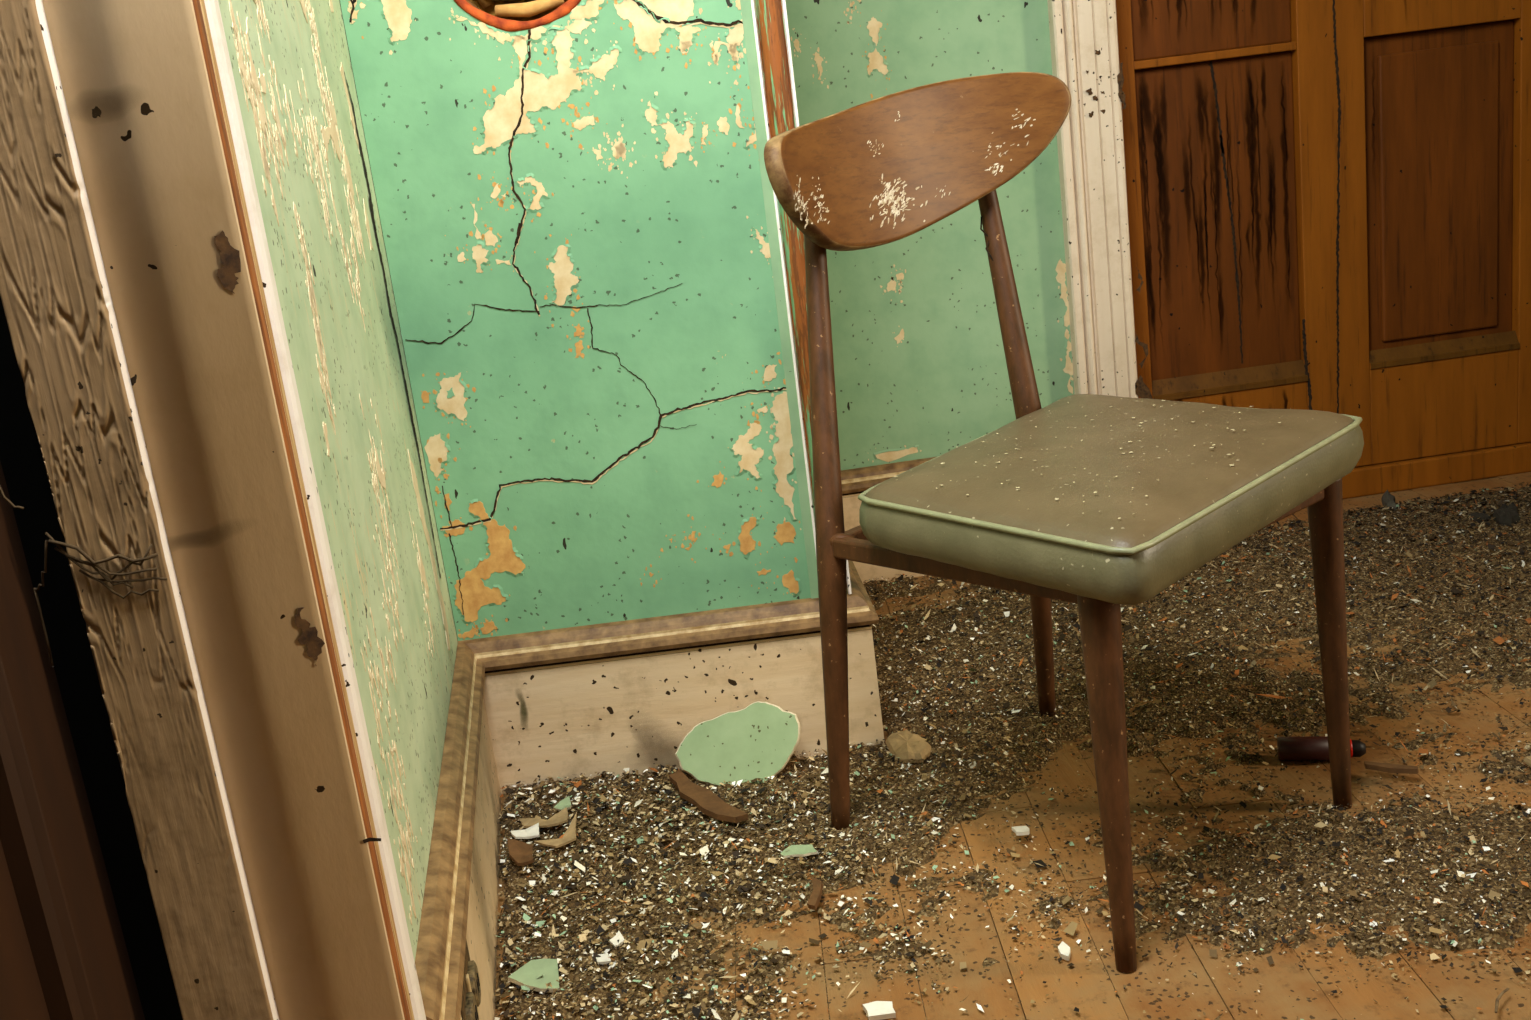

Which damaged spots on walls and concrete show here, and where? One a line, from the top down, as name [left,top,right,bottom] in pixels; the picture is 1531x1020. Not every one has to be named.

crack [349,0,357,24]
crack [628,0,743,28]
peeling [791,28,829,89]
peeling [844,0,892,98]
peeling [445,0,757,273]
peeling [534,234,590,359]
crack [344,29,786,619]
peeling [880,265,906,303]
peeling [640,352,802,596]
peeling [868,445,922,462]
peeling [295,607,325,666]
peeling [359,372,525,925]